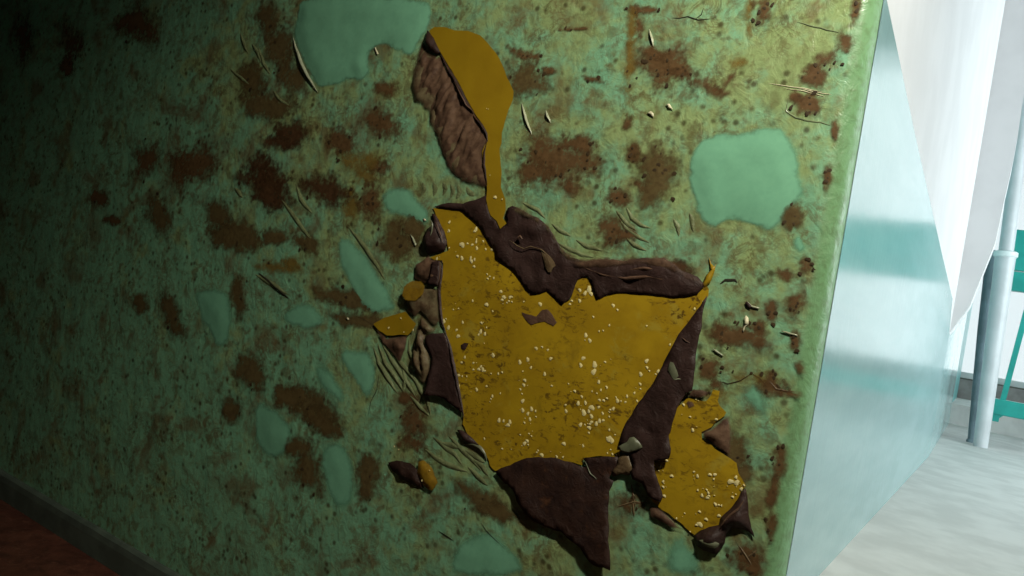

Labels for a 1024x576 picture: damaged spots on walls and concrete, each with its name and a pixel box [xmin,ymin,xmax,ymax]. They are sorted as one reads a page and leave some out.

corrosion [625,5,735,97]
corrosion [789,35,852,116]
corrosion [518,131,604,197]
corrosion [626,142,646,163]
corrosion [823,168,833,189]
corrosion [831,121,840,140]
peeling [374,27,754,570]
corrosion [705,294,805,349]
corrosion [791,331,804,374]
corrosion [758,369,801,397]